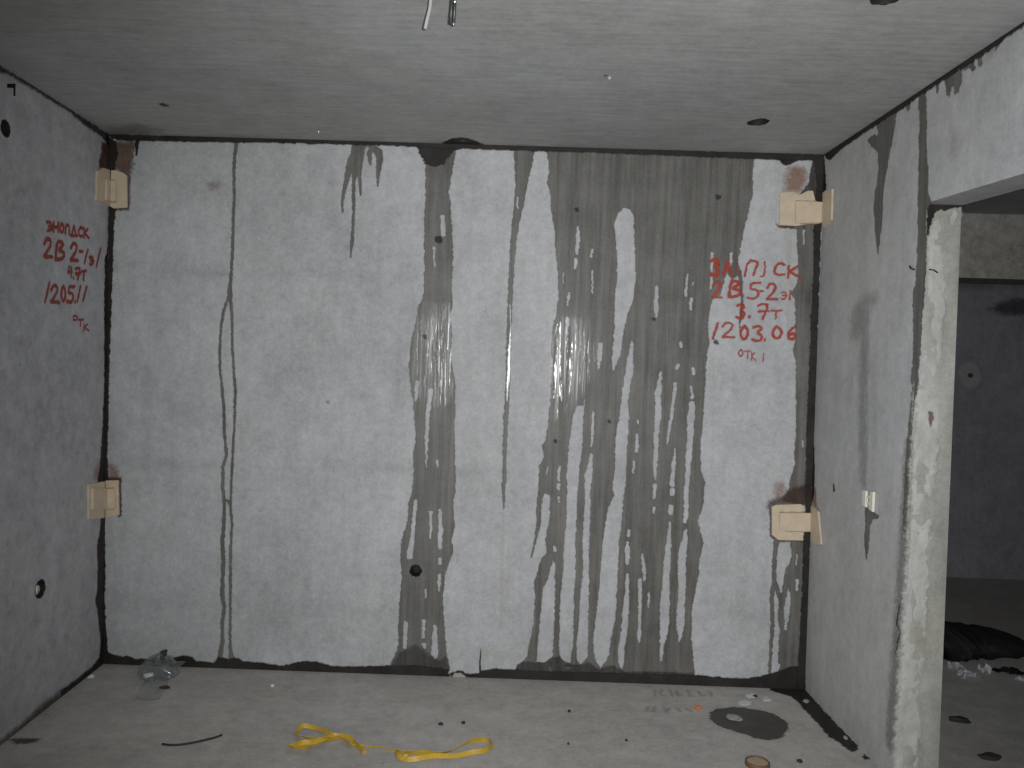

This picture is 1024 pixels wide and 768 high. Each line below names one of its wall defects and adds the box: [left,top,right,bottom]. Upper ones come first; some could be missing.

corrosion [99,133,135,210]
water stain [218,142,238,659]
water stain [341,145,383,257]
water stain [391,138,482,671]
water stain [501,150,534,509]
water stain [516,151,754,675]
water stain [710,707,788,740]
water stain [768,538,803,674]
corrosion [769,487,816,542]
corrosion [785,168,805,190]
water stain [786,224,814,505]
water stain [868,56,983,532]